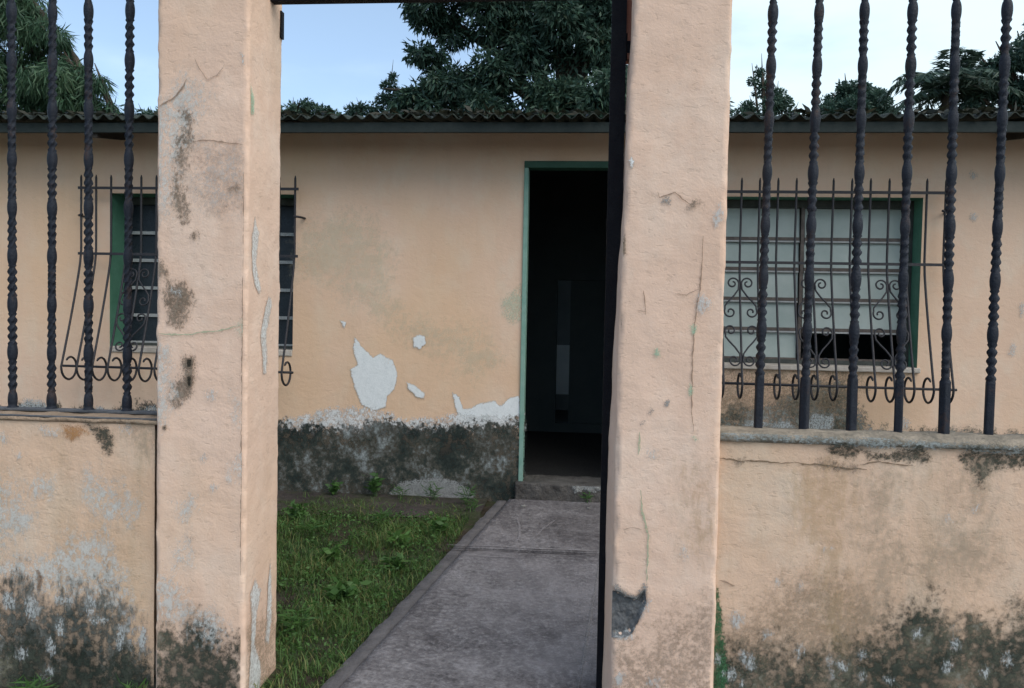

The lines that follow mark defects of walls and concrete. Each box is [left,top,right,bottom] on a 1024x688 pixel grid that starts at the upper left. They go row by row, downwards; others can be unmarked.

leakage [170,110,199,238]
leakage [158,258,197,328]
leakage [168,354,195,408]
peeling [252,218,272,374]
peeling [280,338,520,434]
leakage [277,415,527,502]
peeling [413,335,426,349]
crack [720,458,912,472]
leakage [720,369,1024,489]
leakage [0,564,274,688]
spalling [611,583,652,640]
leakage [612,570,1024,688]